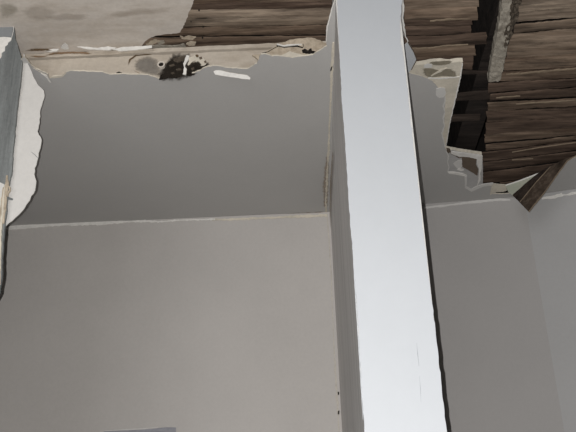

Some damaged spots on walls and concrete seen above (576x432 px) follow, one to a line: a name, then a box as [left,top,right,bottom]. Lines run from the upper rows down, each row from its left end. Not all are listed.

spalling [504,0,522,48]
spalling [252,37,326,60]
water stain [128,54,159,75]
peeling [183,55,208,75]
peeling [213,70,250,80]
peeling [402,1,507,195]
peeling [6,63,48,226]